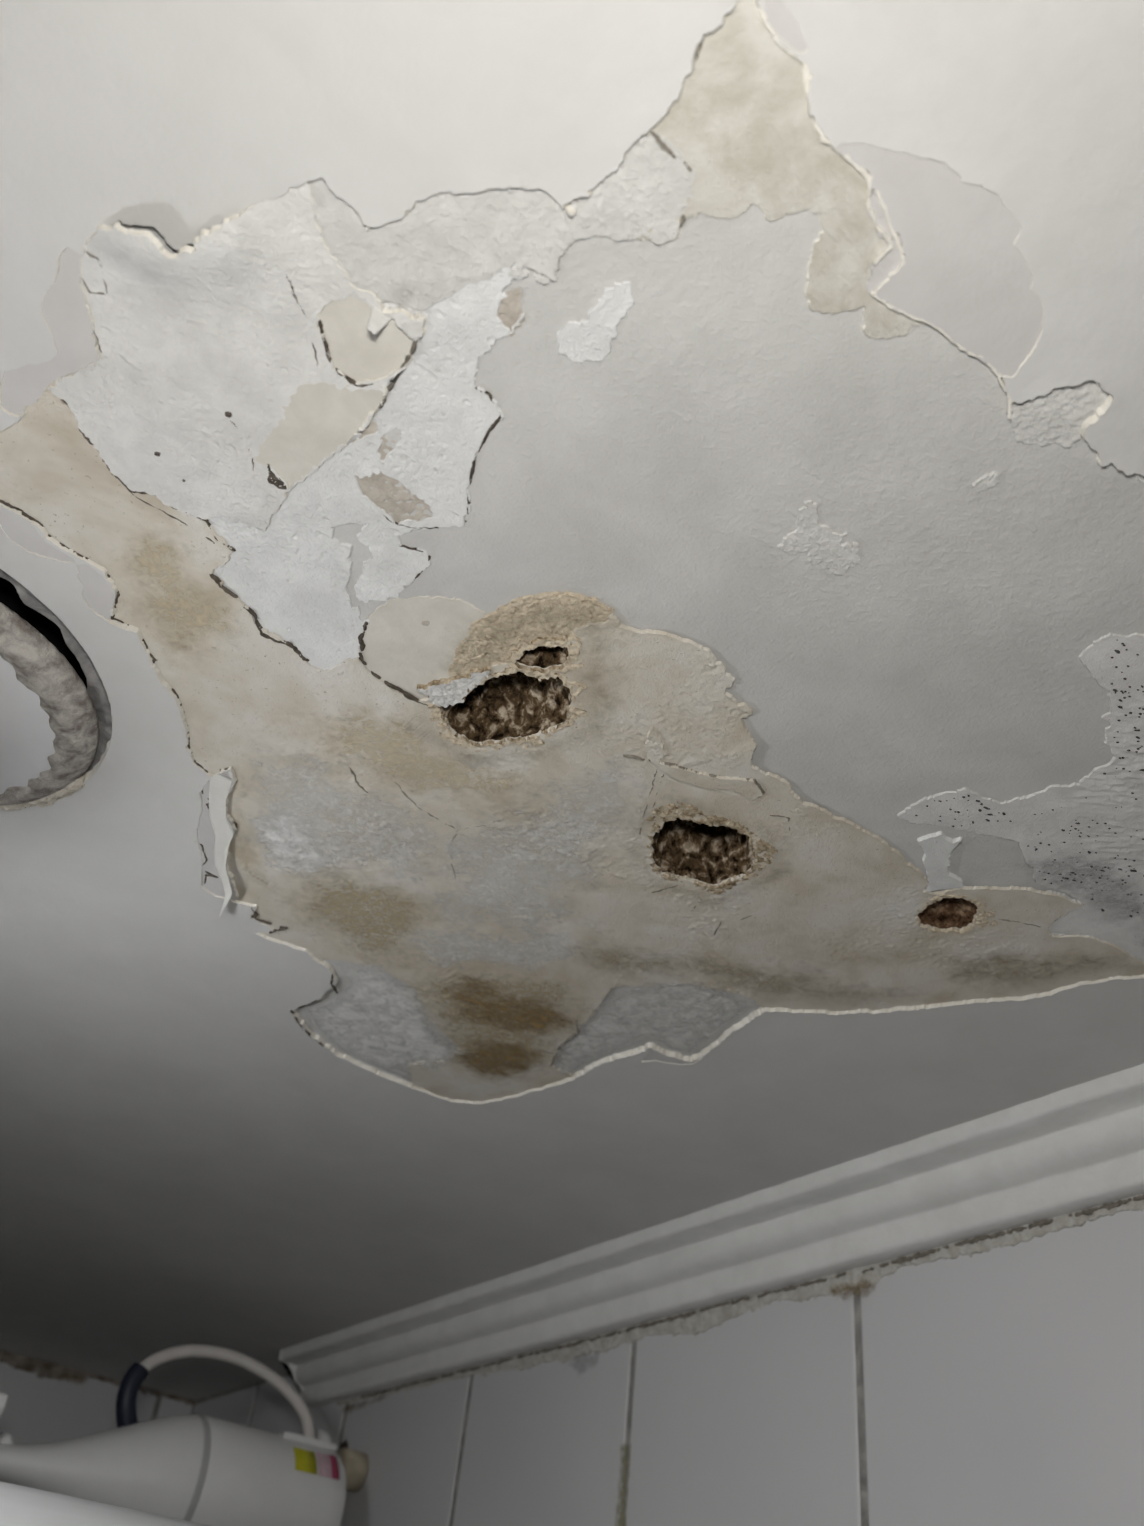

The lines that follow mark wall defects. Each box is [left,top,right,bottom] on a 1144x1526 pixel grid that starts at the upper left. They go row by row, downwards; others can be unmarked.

peeling [0,0,1144,1102]
damp [254,766,623,1075]
damp [557,984,740,1071]
damp [897,632,1144,962]